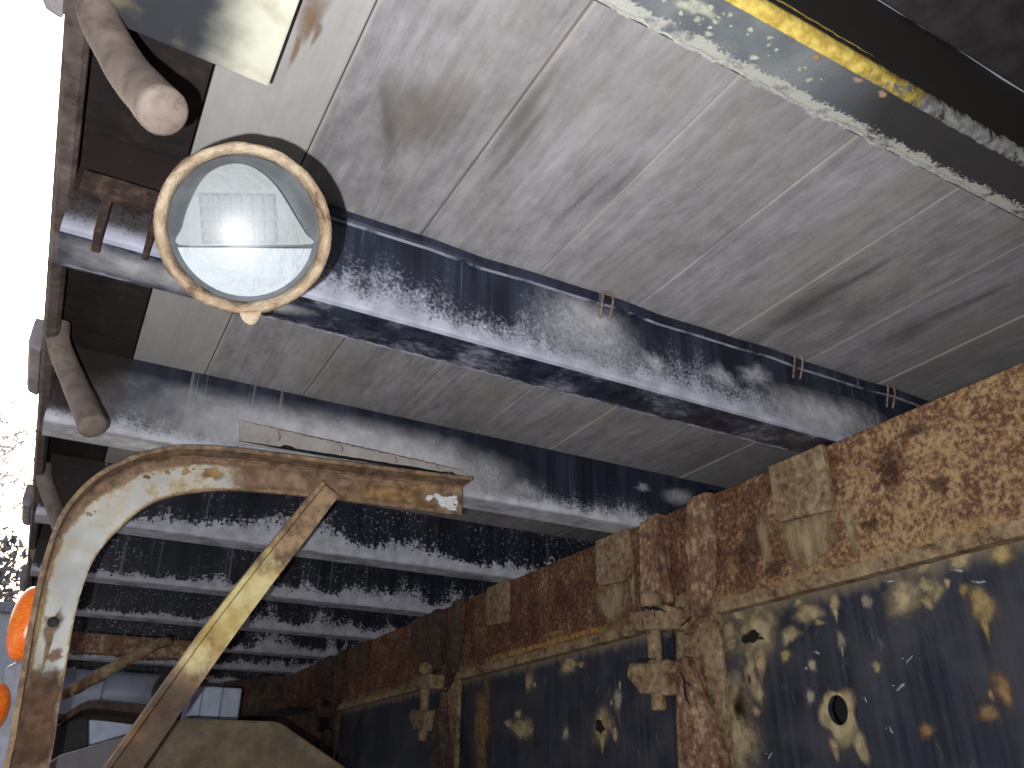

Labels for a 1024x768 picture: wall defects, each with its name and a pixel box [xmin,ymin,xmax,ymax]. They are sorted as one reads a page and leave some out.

damp [777,0,874,57]
peeling [598,0,1024,215]
rust [143,468,222,479]
peeling [425,493,458,511]
rust [784,514,827,563]
rust [991,544,1013,563]
rust [891,564,994,642]
hole [741,630,764,644]
rust [595,682,622,752]
rust [722,595,845,768]
rust [807,690,868,761]
rust [980,674,1011,721]